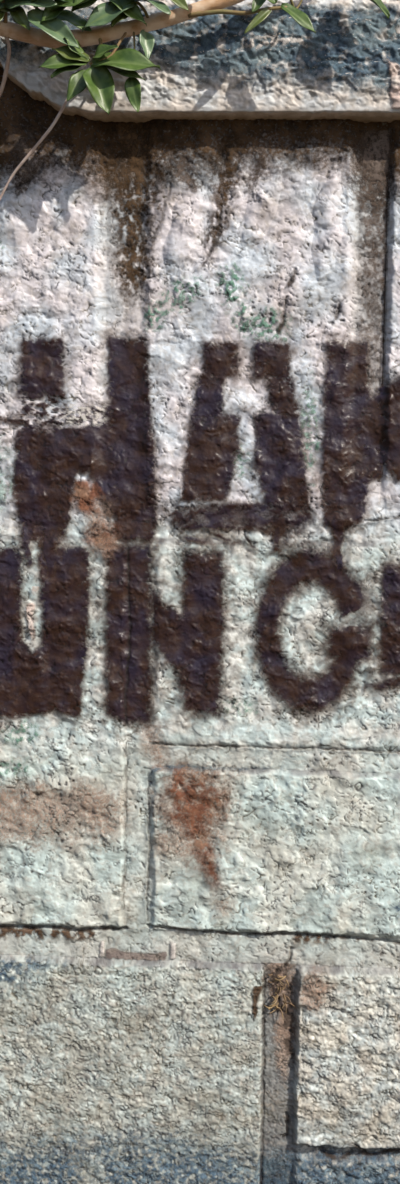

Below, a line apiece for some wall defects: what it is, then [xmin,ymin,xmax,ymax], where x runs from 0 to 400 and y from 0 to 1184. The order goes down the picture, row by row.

damp [0,67,400,386]
rust [74,480,116,553]
rust [145,725,232,884]